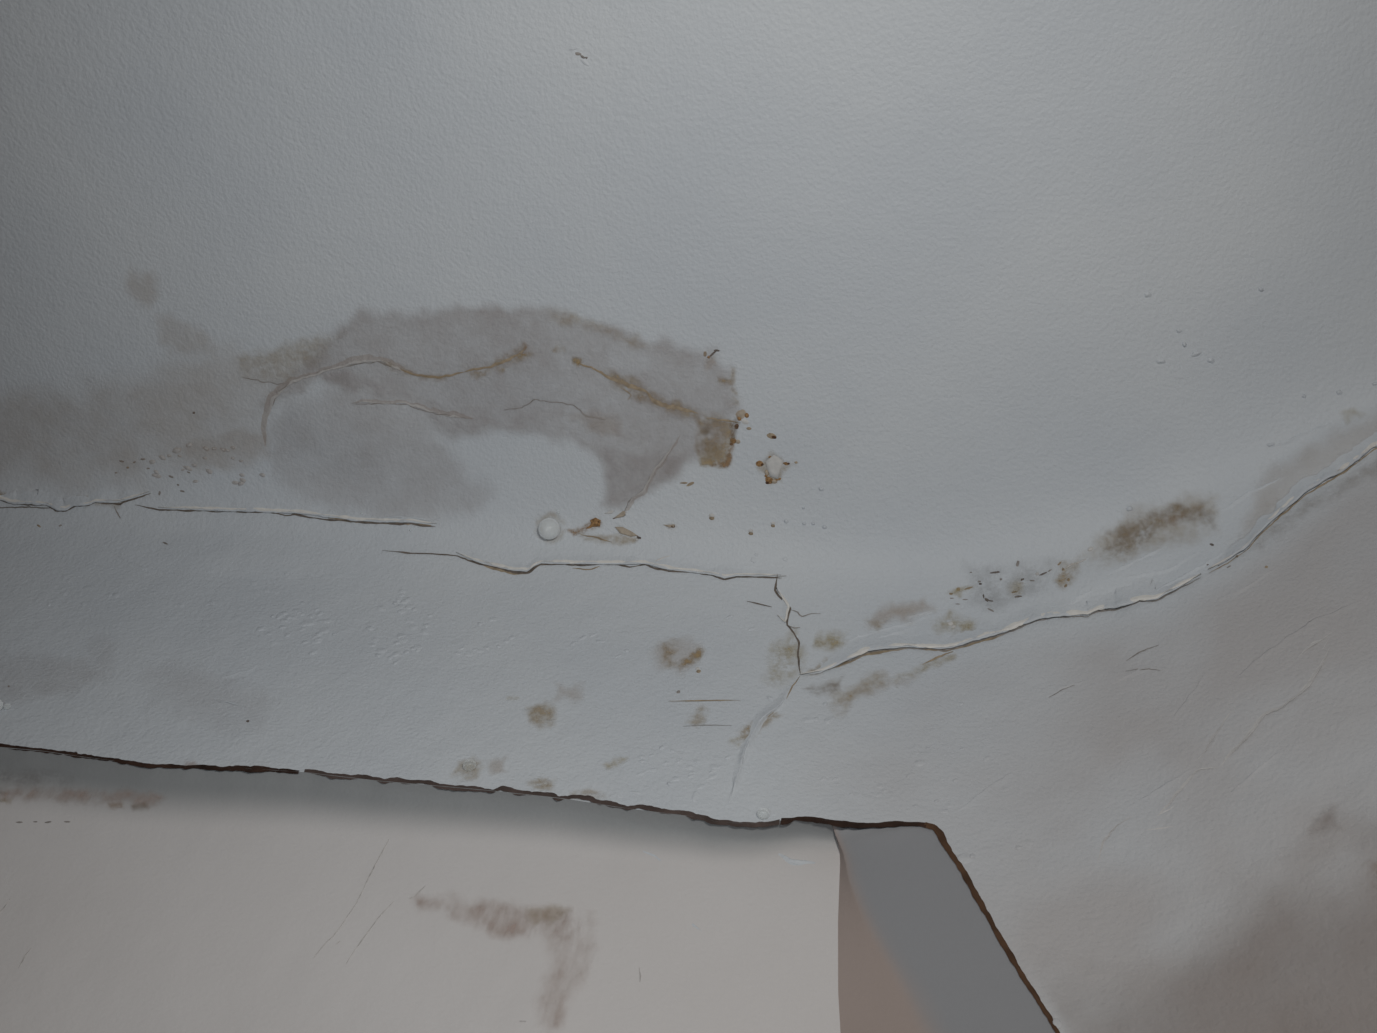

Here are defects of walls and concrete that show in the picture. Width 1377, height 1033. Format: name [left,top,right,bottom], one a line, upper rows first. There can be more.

crack [506,360,738,512]
crack [0,418,1377,676]